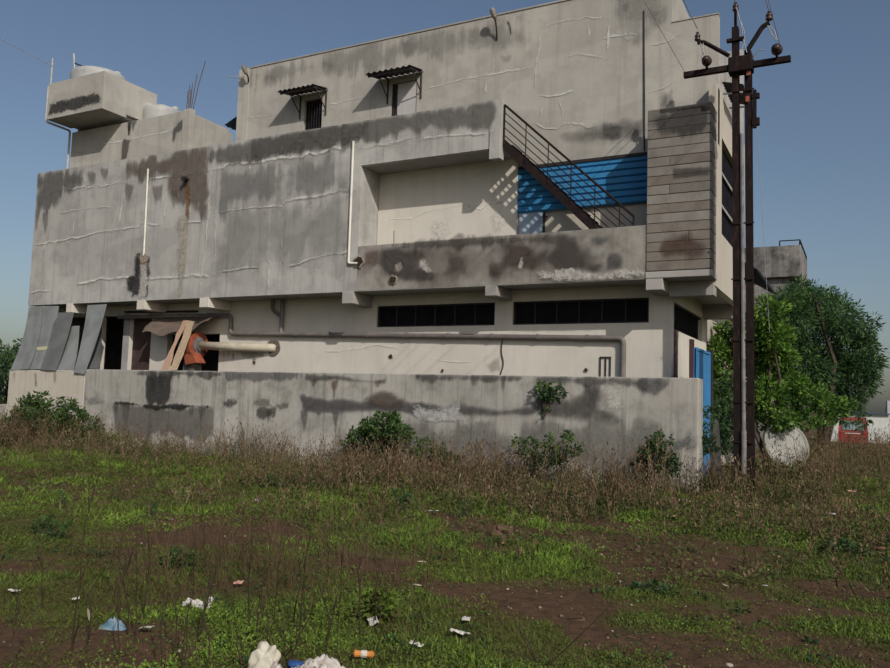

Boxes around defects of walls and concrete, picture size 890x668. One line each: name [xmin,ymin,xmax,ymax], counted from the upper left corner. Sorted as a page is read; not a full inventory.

crack [427,16,635,129]
water stain [49,93,100,114]
water stain [122,101,495,217]
water stain [36,170,82,219]
crack [36,173,170,245]
crack [78,133,484,294]
water stain [366,216,622,279]
water stain [126,253,150,297]
water stain [114,371,295,411]
water stain [256,399,288,419]
water stain [303,380,500,415]
water stain [514,376,668,420]